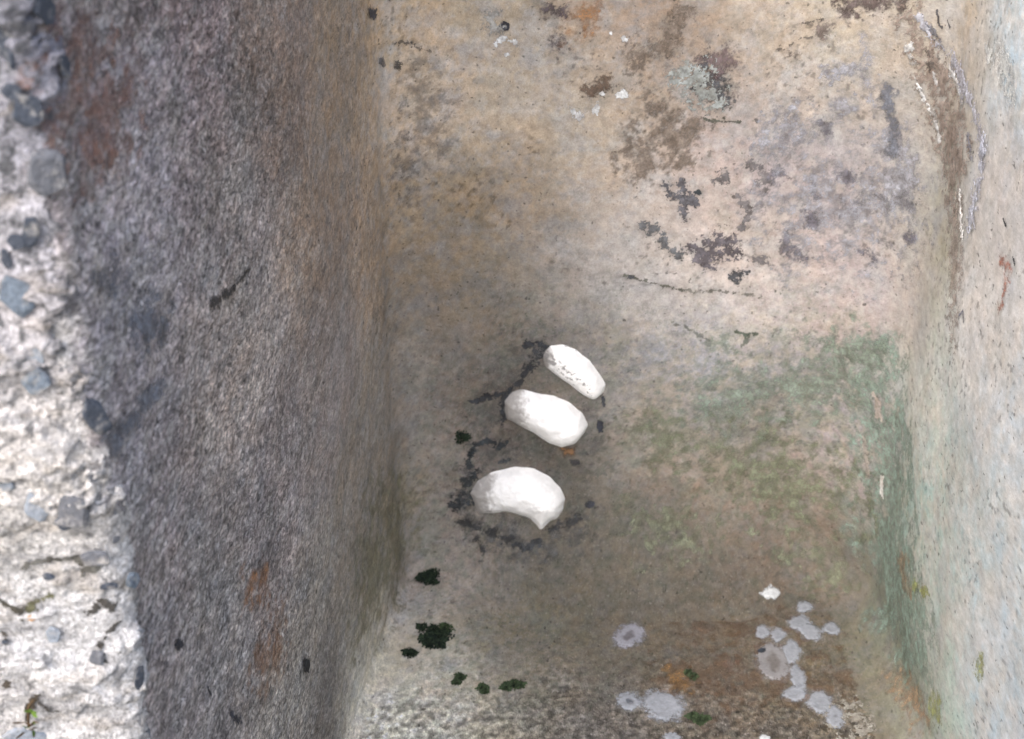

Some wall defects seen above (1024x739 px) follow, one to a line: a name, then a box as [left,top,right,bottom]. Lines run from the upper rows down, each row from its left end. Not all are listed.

damp [580,0,696,98]
damp [611,44,738,186]
damp [749,0,925,286]
crack [623,274,762,299]